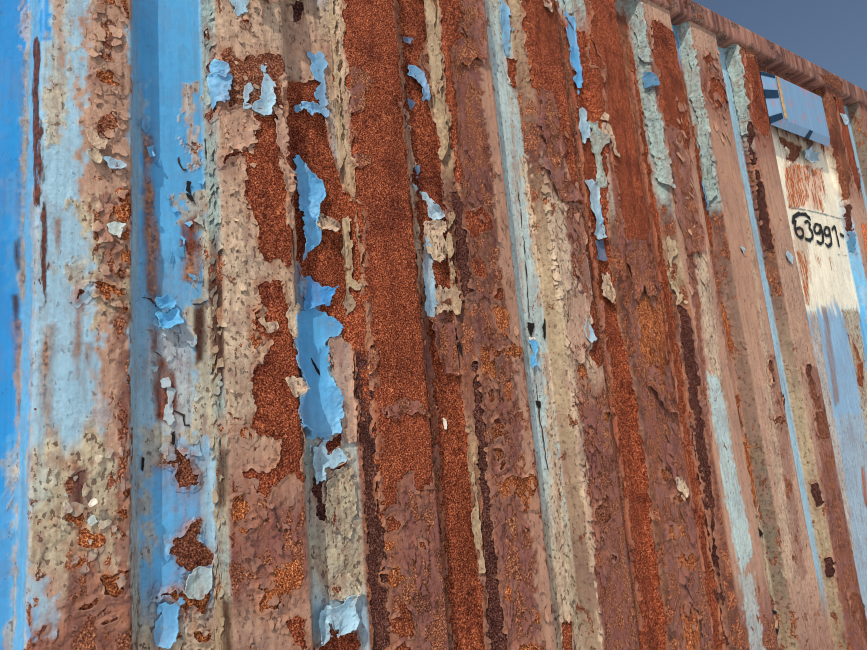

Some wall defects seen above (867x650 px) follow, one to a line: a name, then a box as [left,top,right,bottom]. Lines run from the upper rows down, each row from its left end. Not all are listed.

corrosion [31,37,59,303]
peeling [85,0,132,308]
corrosion [742,52,867,259]
corrosion [194,282,229,388]
peeling [159,41,365,539]
peeling [367,347,380,374]
corrosion [202,0,546,650]
corrosion [501,0,733,650]
corrosion [847,324,865,388]
corrosion [150,516,231,650]
peeling [241,501,297,584]
peeling [267,595,295,634]